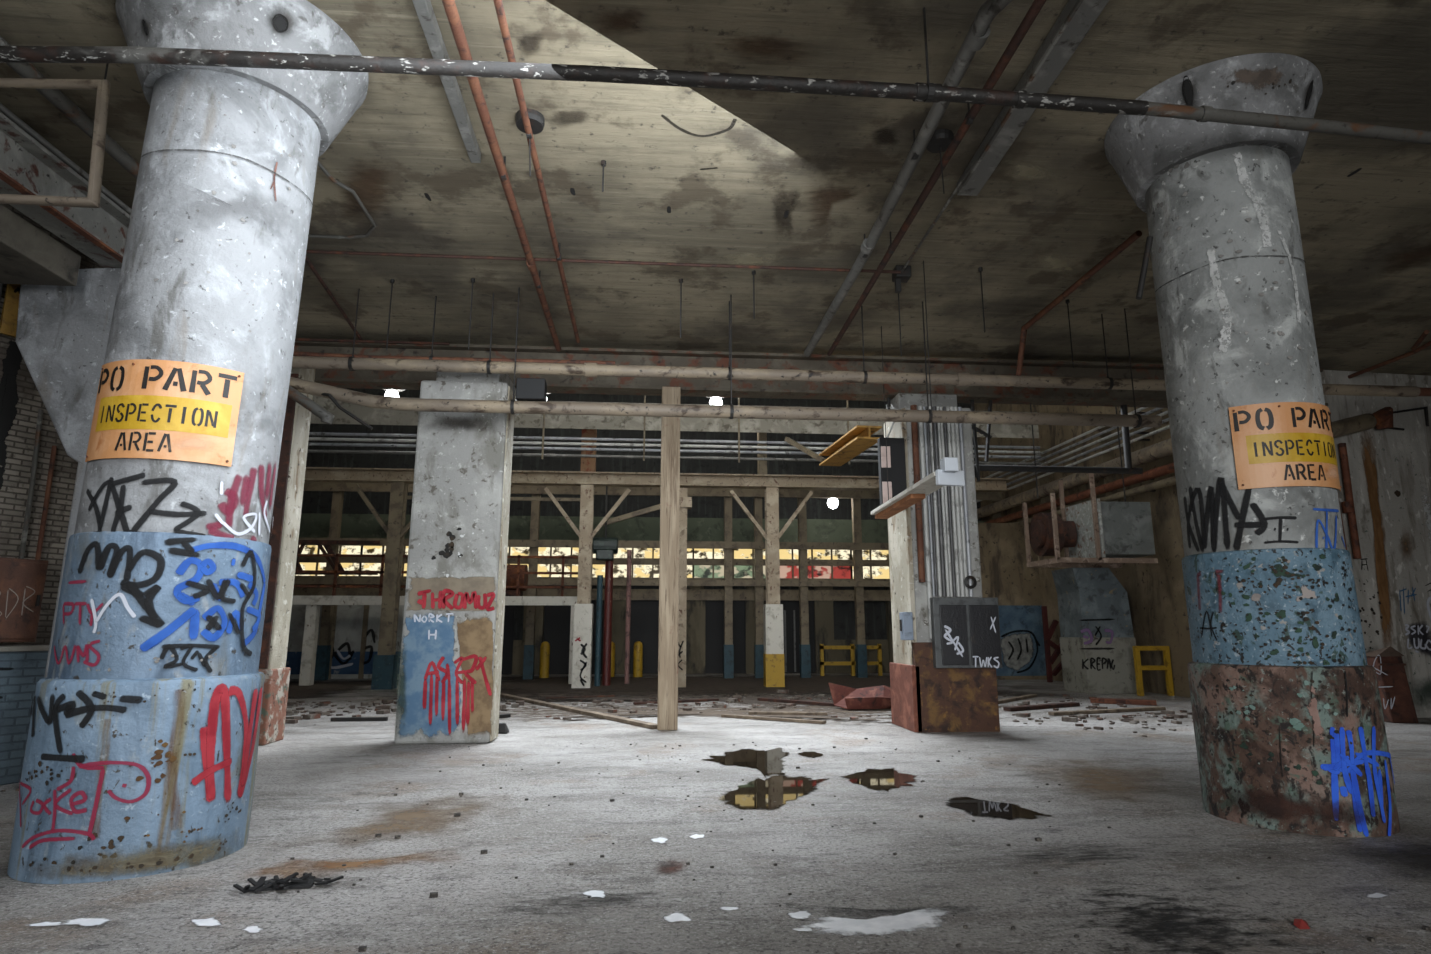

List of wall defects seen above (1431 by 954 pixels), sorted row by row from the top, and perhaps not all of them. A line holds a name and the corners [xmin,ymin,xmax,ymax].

water stain [519,35,540,53]
water stain [813,189,853,220]
peeling [1196,554,1383,785]
rust [1233,790,1359,822]